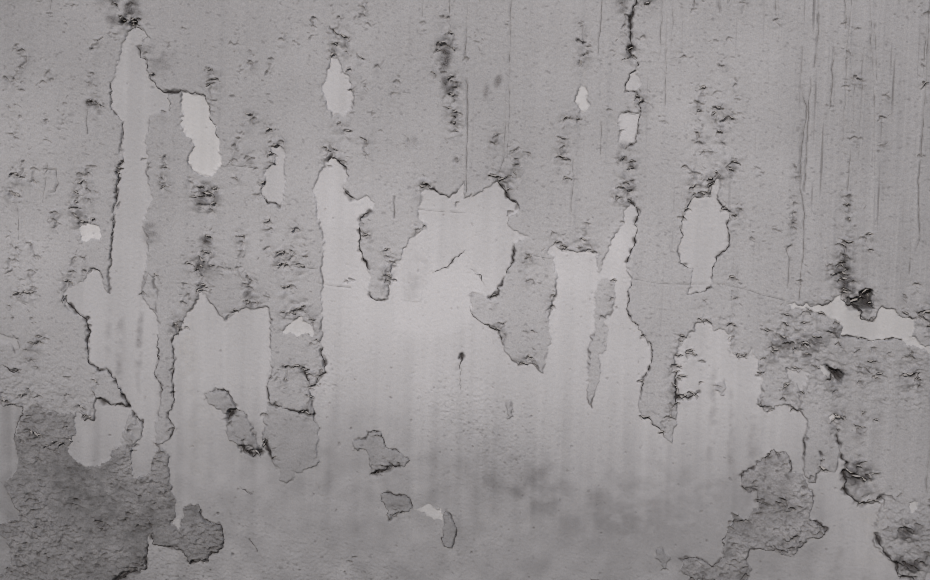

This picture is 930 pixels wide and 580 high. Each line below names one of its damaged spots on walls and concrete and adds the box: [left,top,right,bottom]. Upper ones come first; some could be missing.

peeling [180,62,288,219]
peeling [224,9,389,164]
peeling [427,8,484,140]
peeling [554,86,590,187]
peeling [574,16,596,72]
peeling [614,113,640,149]
peeling [606,0,655,65]
peeling [626,71,649,111]
peeling [690,77,746,162]
peeling [824,16,869,116]
flaking render [0,0,225,580]
peeling [119,141,930,580]